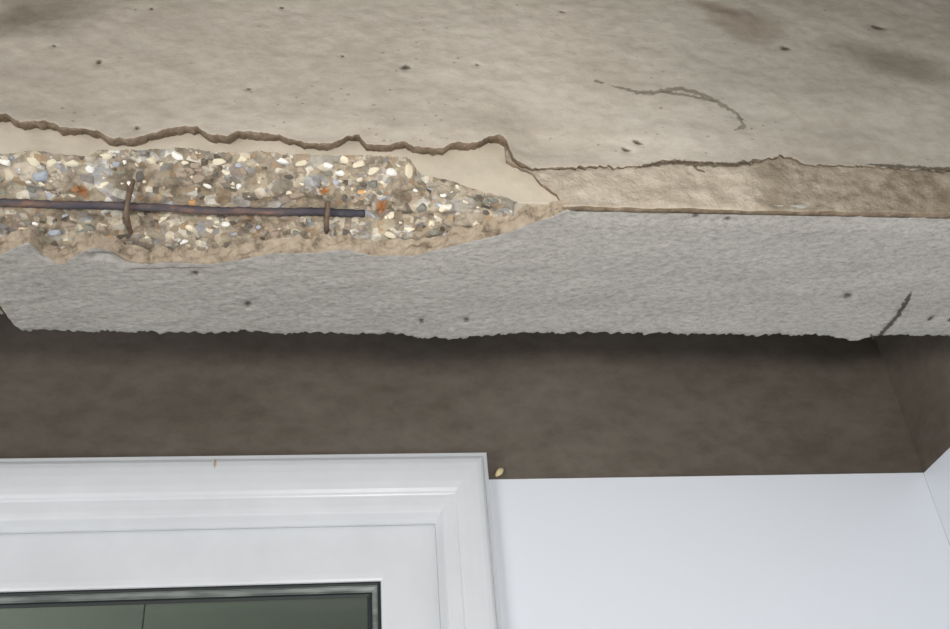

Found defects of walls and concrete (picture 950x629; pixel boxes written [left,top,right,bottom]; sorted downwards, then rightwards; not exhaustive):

spalling [0,147,515,252]
crack [870,293,911,340]